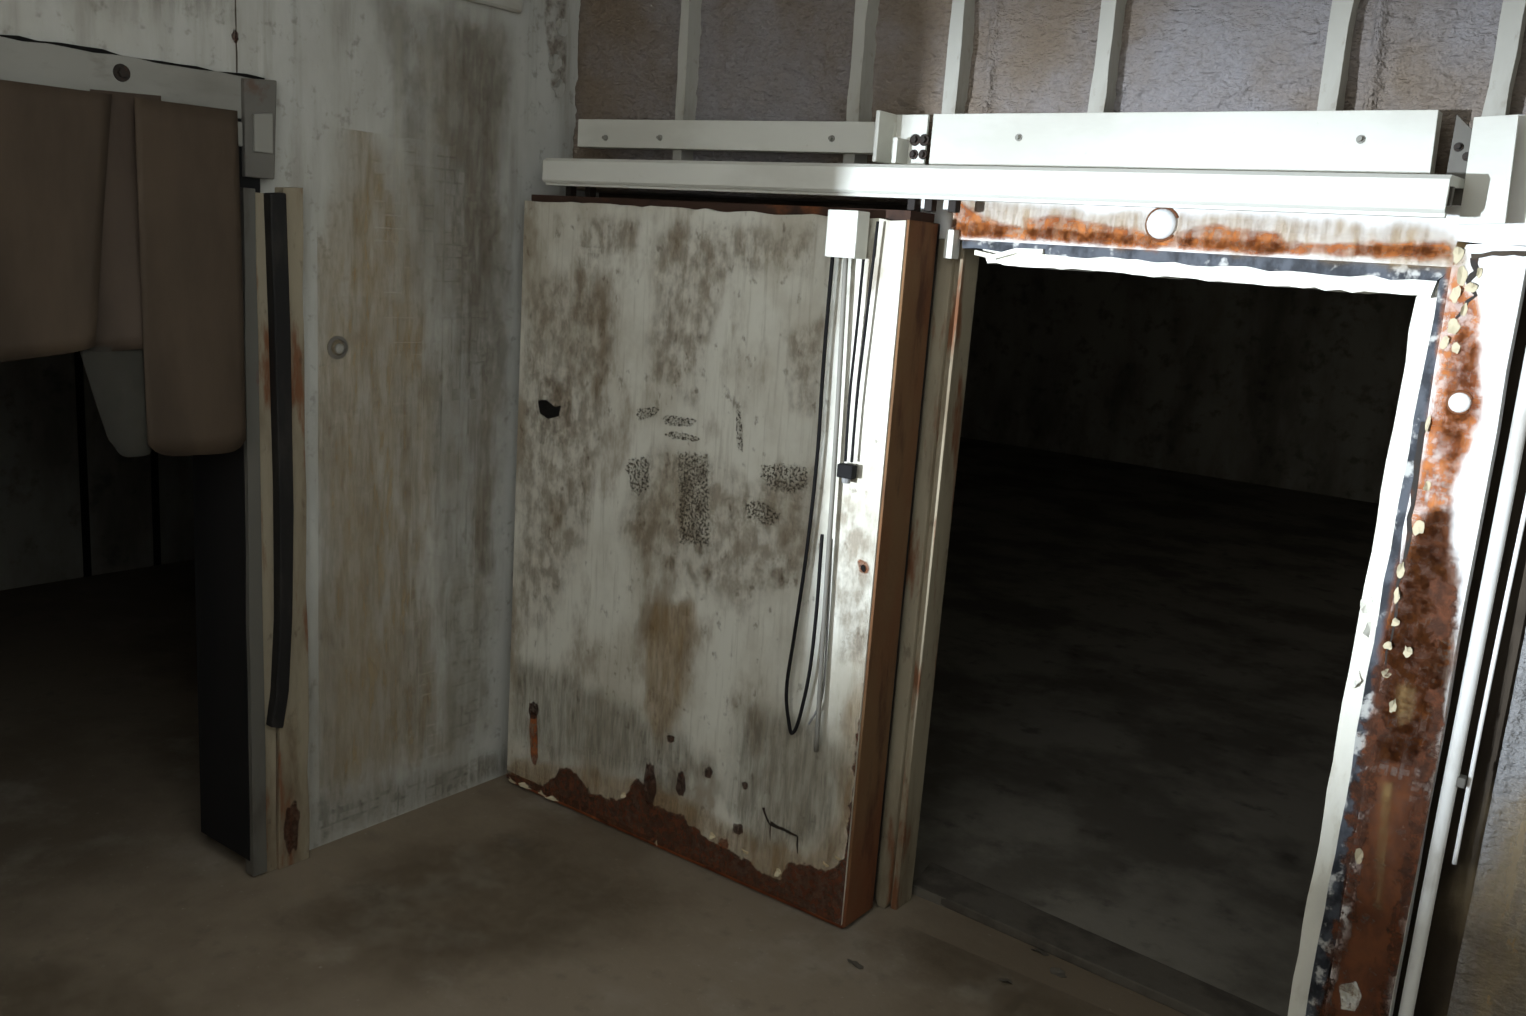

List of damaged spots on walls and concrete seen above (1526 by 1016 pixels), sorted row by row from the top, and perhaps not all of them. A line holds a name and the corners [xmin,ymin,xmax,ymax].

water stain [318,156,431,778]
rust [507,702,860,925]
rust [952,201,1481,1016]